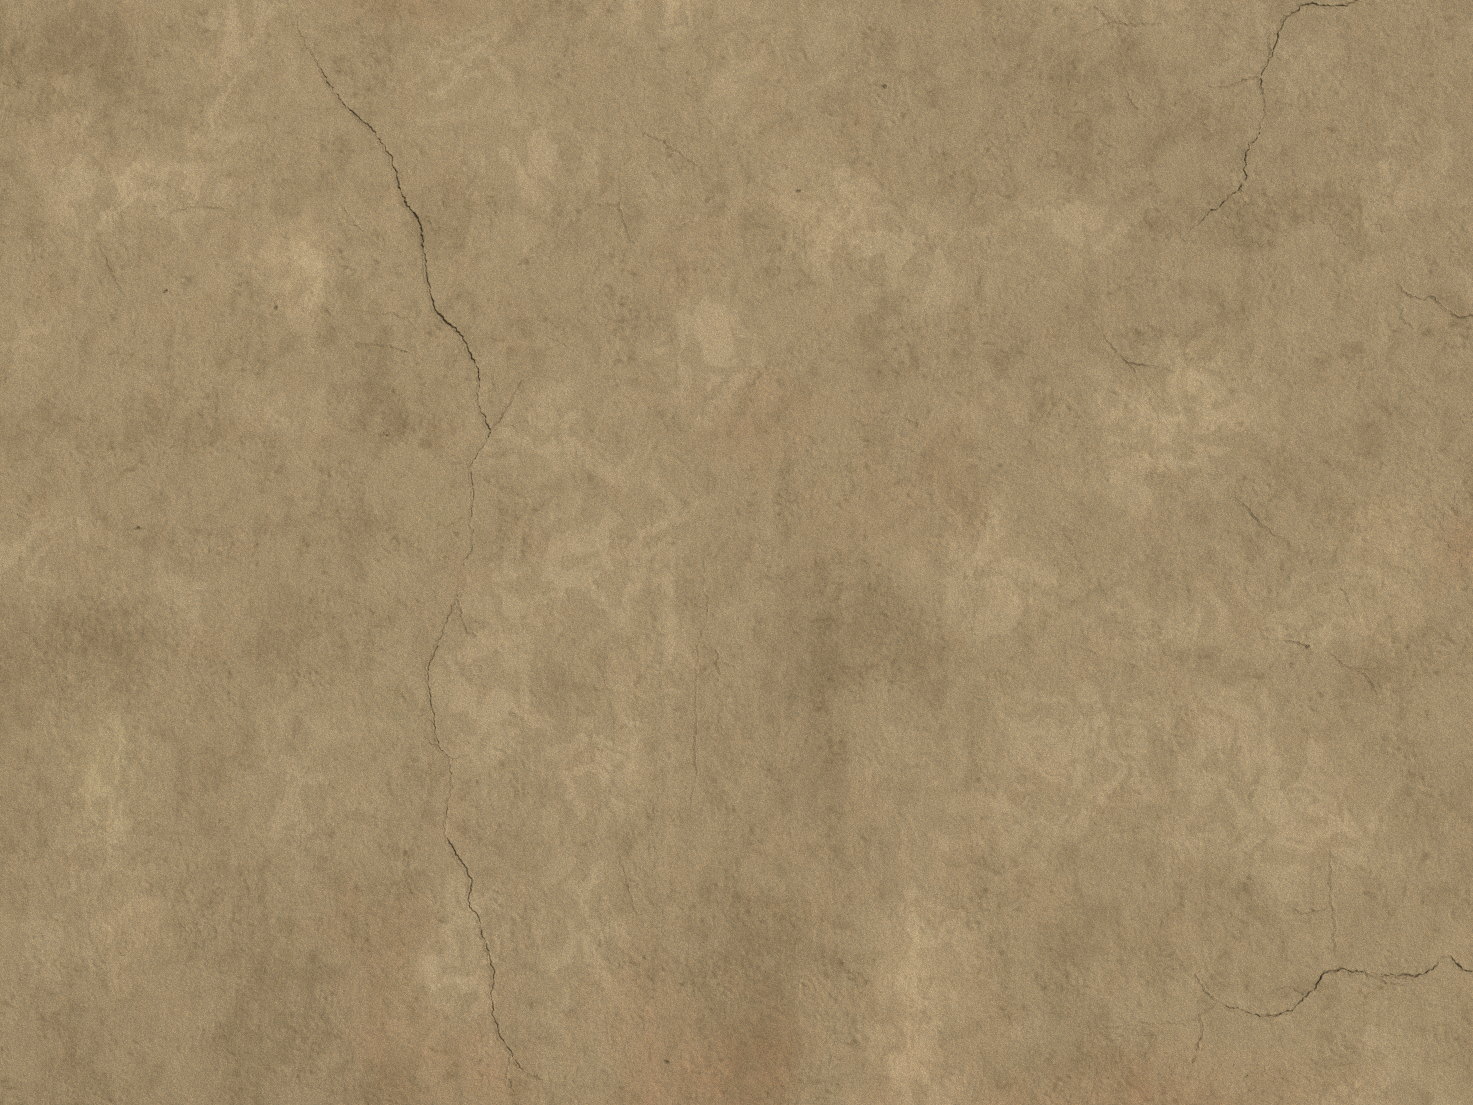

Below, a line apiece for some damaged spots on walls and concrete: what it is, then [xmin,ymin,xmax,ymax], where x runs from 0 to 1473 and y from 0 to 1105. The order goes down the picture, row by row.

crack [1189,0,1361,233]
crack [296,14,545,1092]
crack [1108,851,1473,1103]